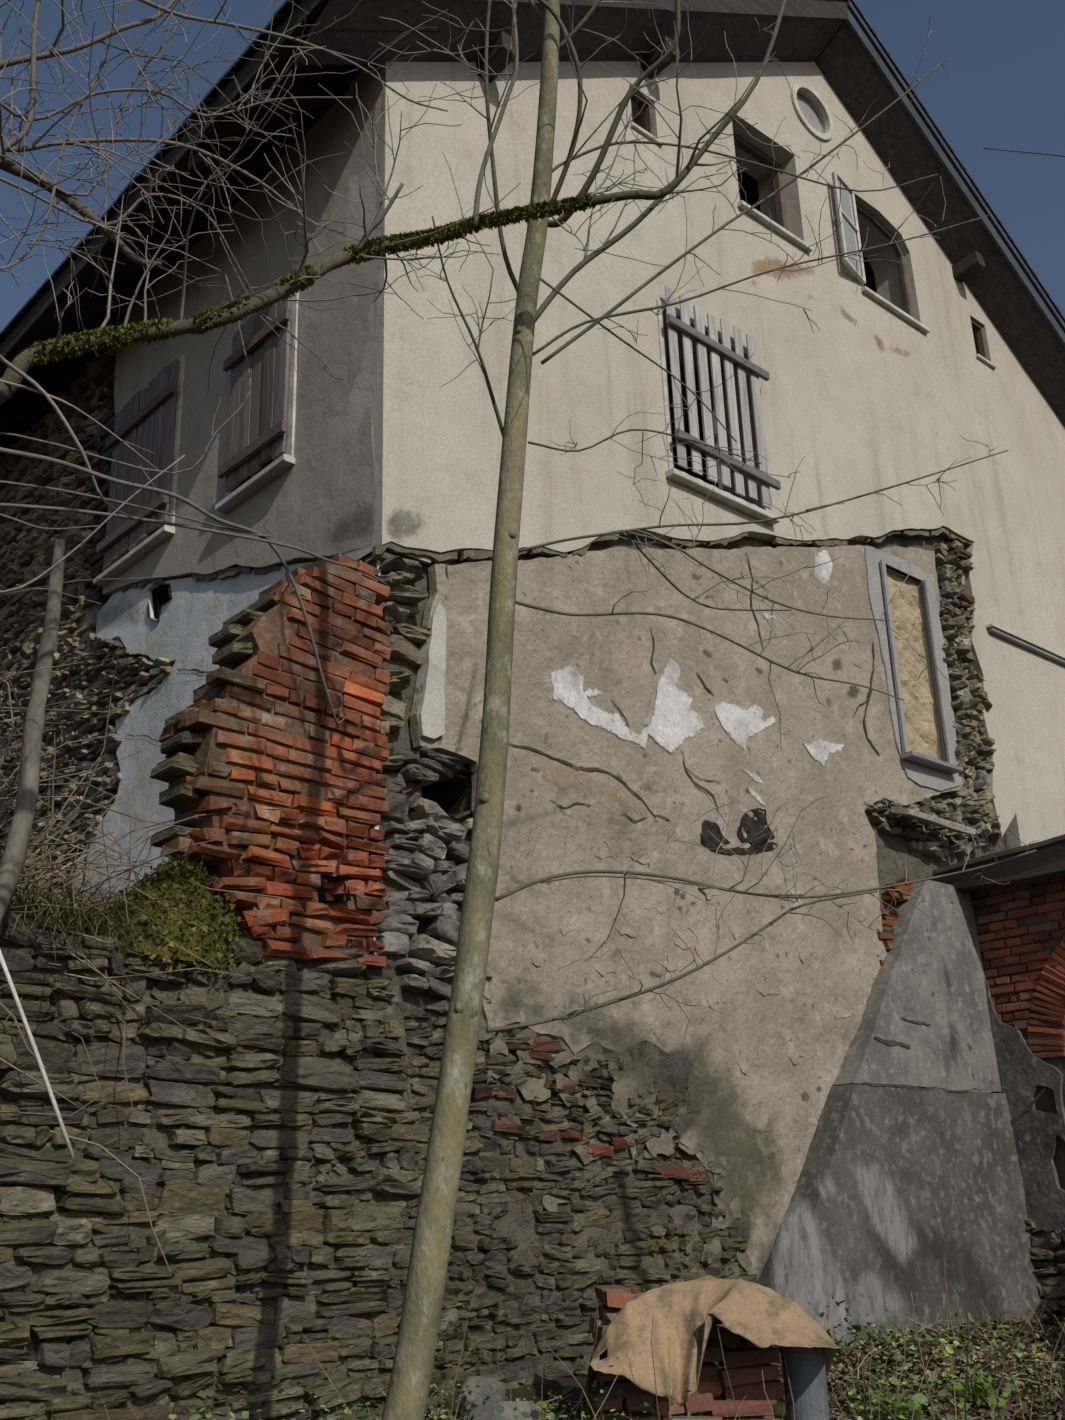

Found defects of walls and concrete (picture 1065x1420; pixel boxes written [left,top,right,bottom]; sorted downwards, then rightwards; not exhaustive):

flaking render [192,564,283,582]
damp [332,508,420,539]
flaking render [518,534,619,557]
flaking render [669,532,748,548]
flaking render [773,536,848,582]
peeling [551,660,775,757]
flaking render [864,527,1002,863]
peeling [804,735,844,765]
flaking render [699,769,778,855]
flaking render [365,542,493,1173]
hole [317,874,352,903]
flaking render [435,1023,757,1396]